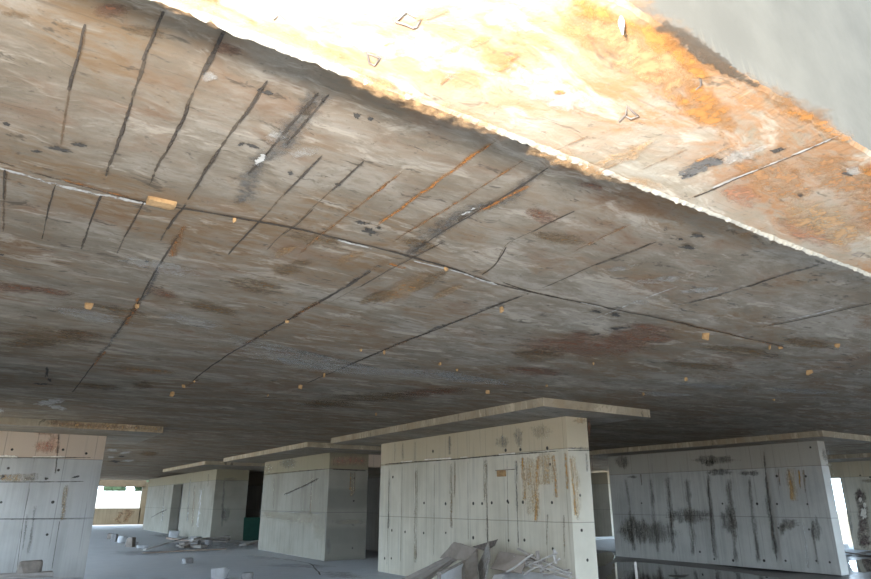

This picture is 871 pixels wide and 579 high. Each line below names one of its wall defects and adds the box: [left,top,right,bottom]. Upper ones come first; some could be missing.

crack [0,11,225,253]
corrosion [350,68,497,132]
corrosion [381,144,491,223]
crack [160,81,871,387]
corrosion [534,137,648,175]
corrosion [559,0,760,133]
corrosion [723,158,871,246]
corrosion [773,88,851,142]
corrosion [552,454,577,515]
leakage [621,481,736,557]